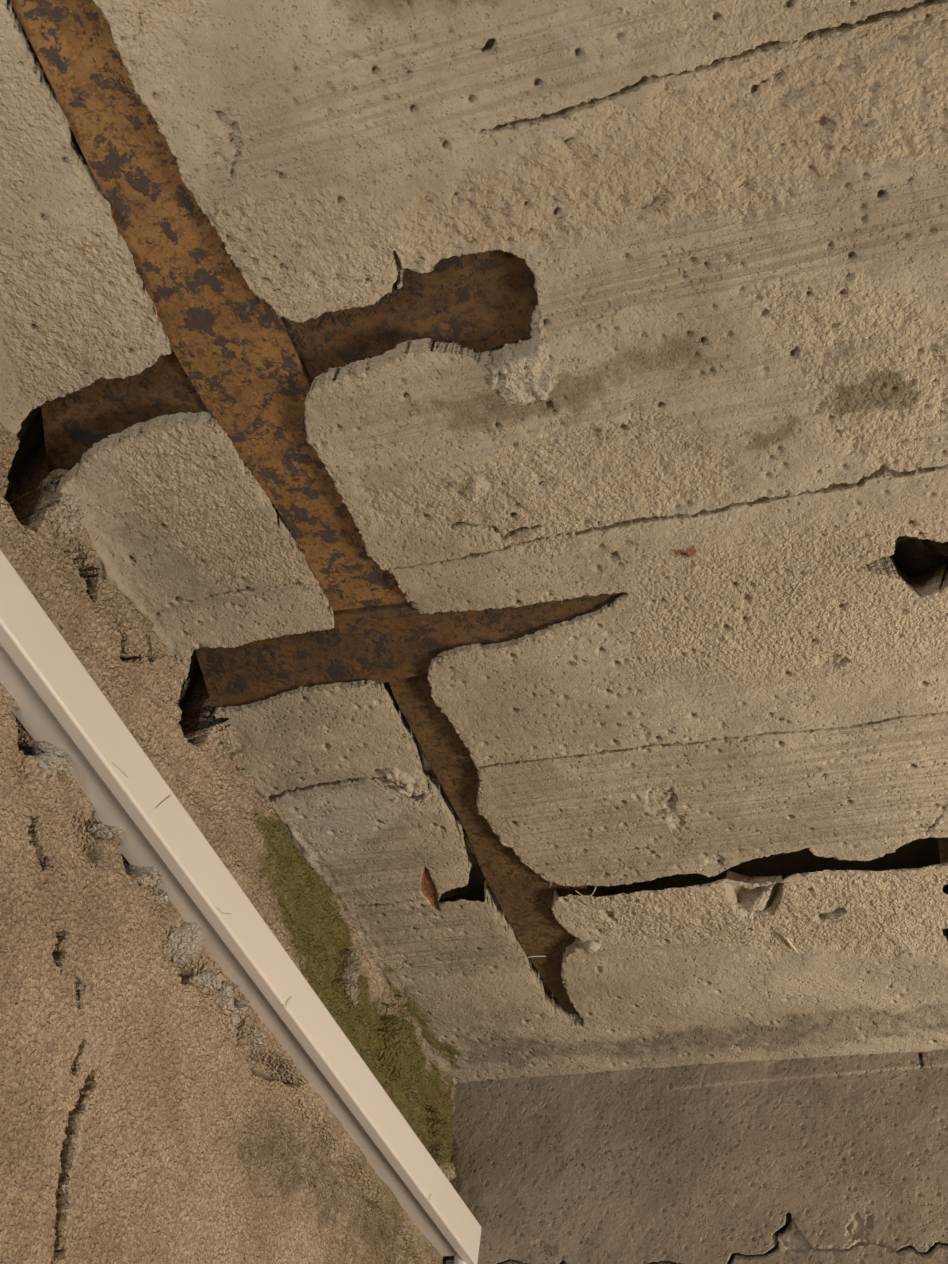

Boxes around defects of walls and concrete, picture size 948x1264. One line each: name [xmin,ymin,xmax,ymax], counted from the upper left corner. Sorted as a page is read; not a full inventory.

spalling [476,36,499,57]
crack [474,0,948,138]
spalling [0,0,476,885]
spalling [304,246,633,880]
crack [384,463,948,570]
crack [475,710,948,769]
damp [263,779,448,886]
corrosion [418,866,477,913]
crack [545,800,948,900]
flaking render [172,962,195,987]
spalling [484,891,586,1028]
crack [726,1211,793,1264]